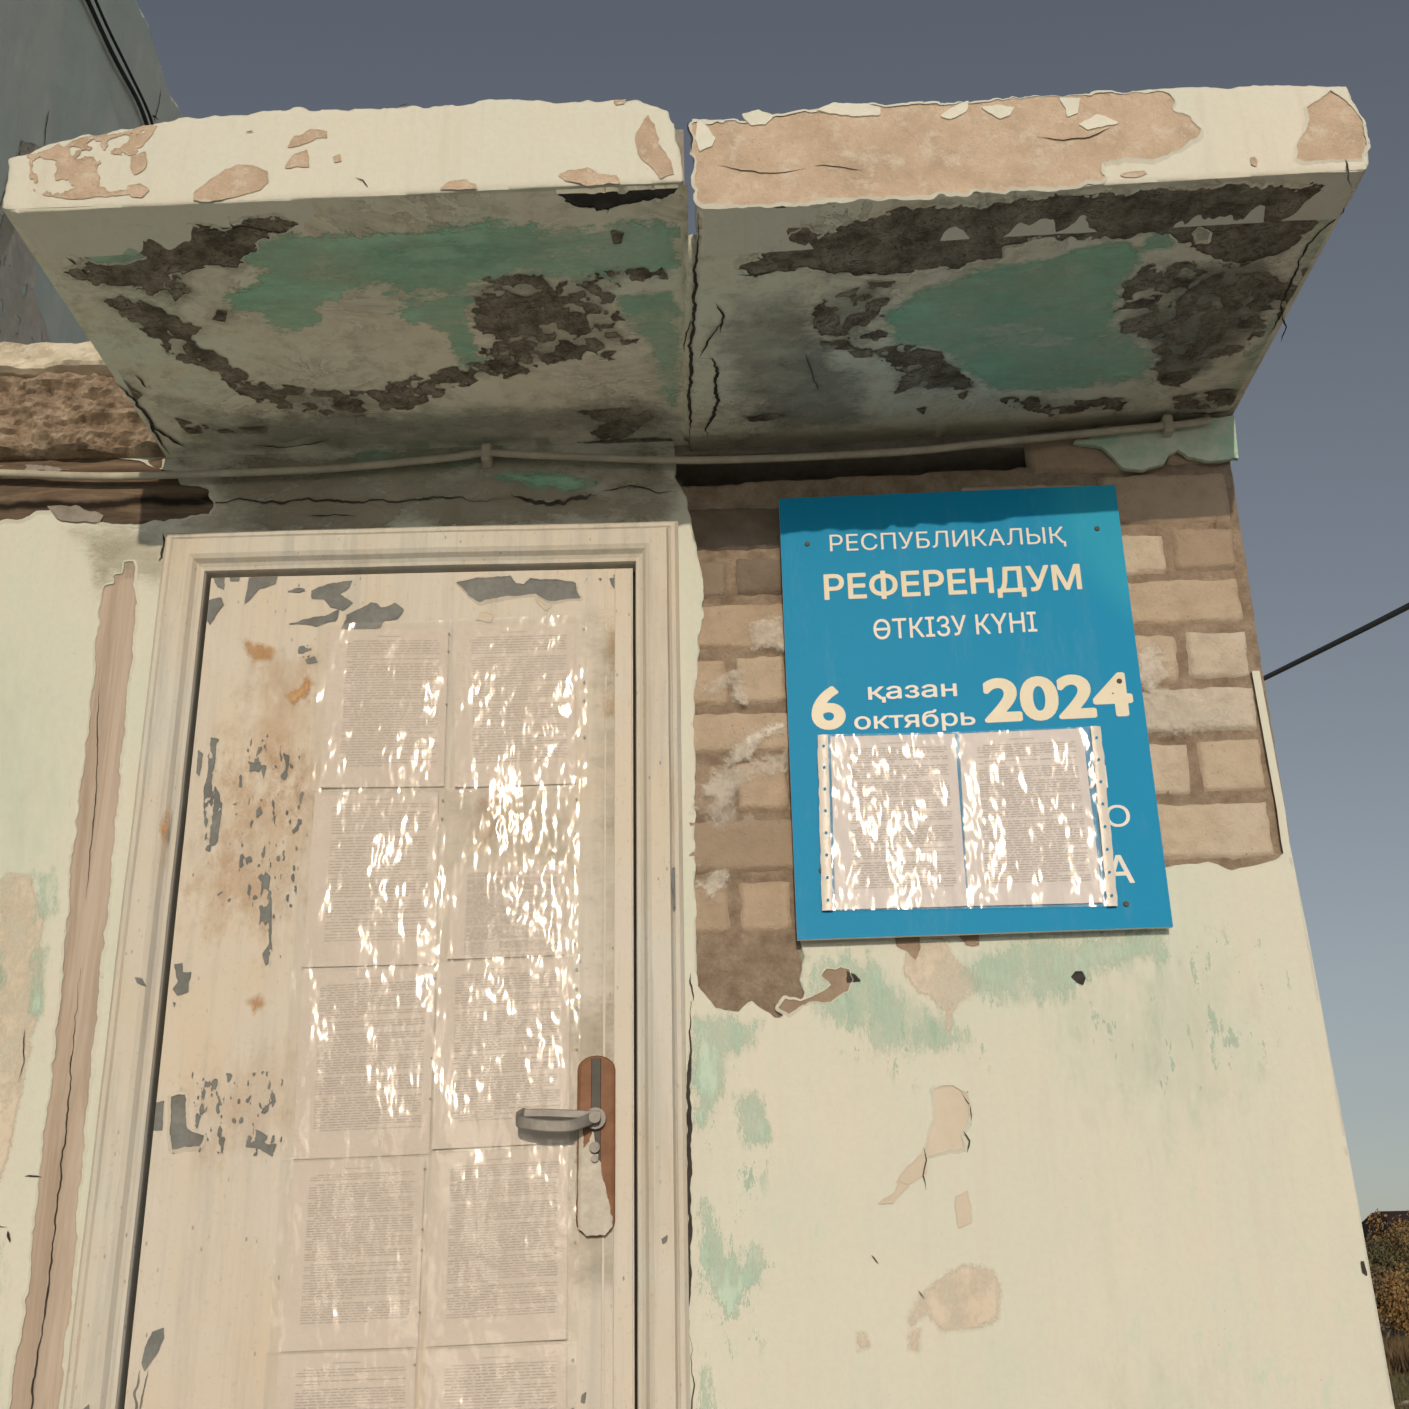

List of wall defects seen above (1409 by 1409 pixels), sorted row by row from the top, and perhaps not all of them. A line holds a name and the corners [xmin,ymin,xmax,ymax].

peeling [20,125,157,199]
peeling [61,89,1371,417]
crack [683,214,725,443]
spalling [174,418,269,434]
peeling [207,577,404,629]
peeling [298,645,318,664]
spalling [196,734,304,965]
peeling [0,874,47,1176]
spalling [172,963,191,1007]
spalling [154,1071,283,1156]
peeling [879,1081,973,1204]
peeling [698,1198,769,1324]